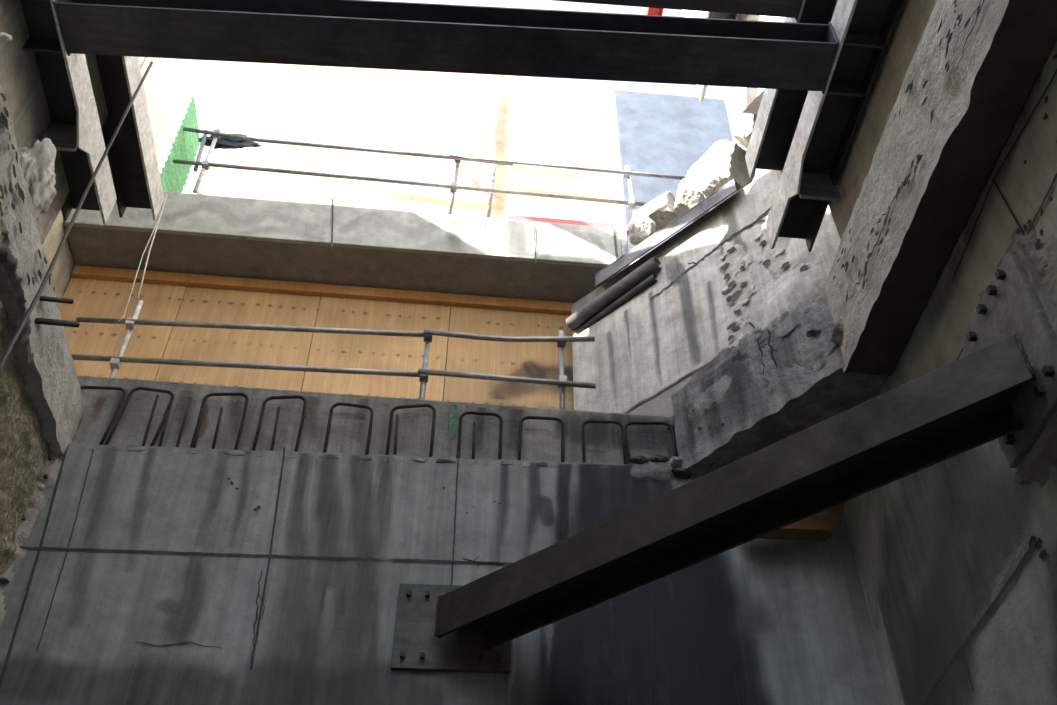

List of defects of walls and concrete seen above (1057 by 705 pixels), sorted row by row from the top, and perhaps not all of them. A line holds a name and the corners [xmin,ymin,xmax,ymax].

crack [956,0,983,69]
spalling [0,93,80,364]
damp [667,258,699,362]
crack [653,207,771,298]
crack [742,319,778,375]
spalling [718,216,809,348]
crack [136,641,222,652]
crack [250,570,265,666]
damp [84,451,439,705]